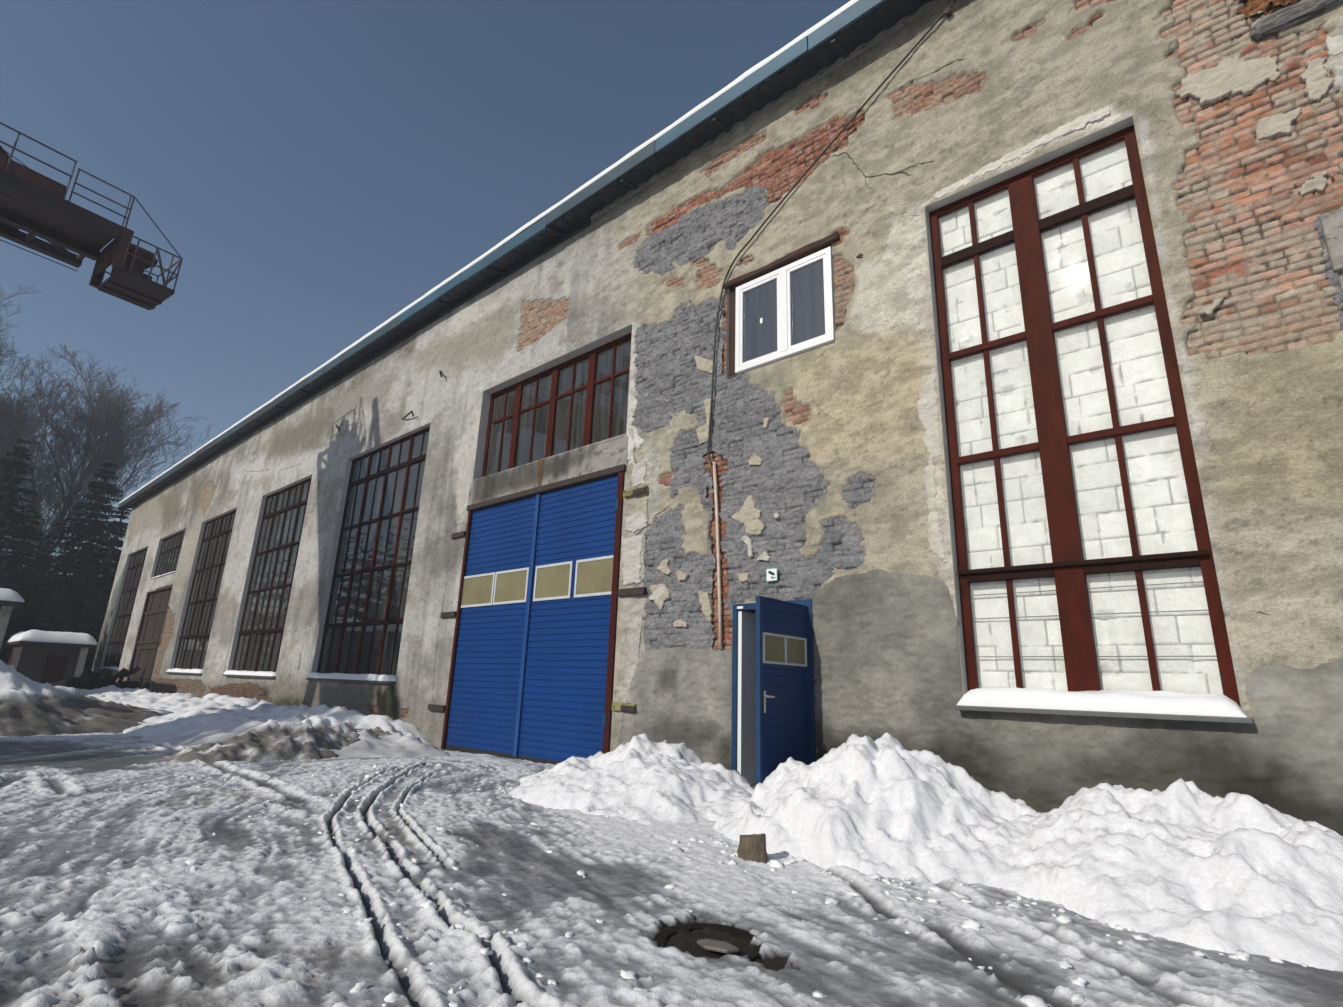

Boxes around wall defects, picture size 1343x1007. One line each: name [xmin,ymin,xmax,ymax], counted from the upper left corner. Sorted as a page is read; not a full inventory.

flaking render [1068,0,1116,41]
flaking render [796,94,828,116]
flaking render [888,72,986,121]
crack [832,142,933,230]
flaking render [1160,0,1343,360]
spalling [517,298,570,353]
peeling [618,109,876,651]
water stain [1232,778,1318,822]